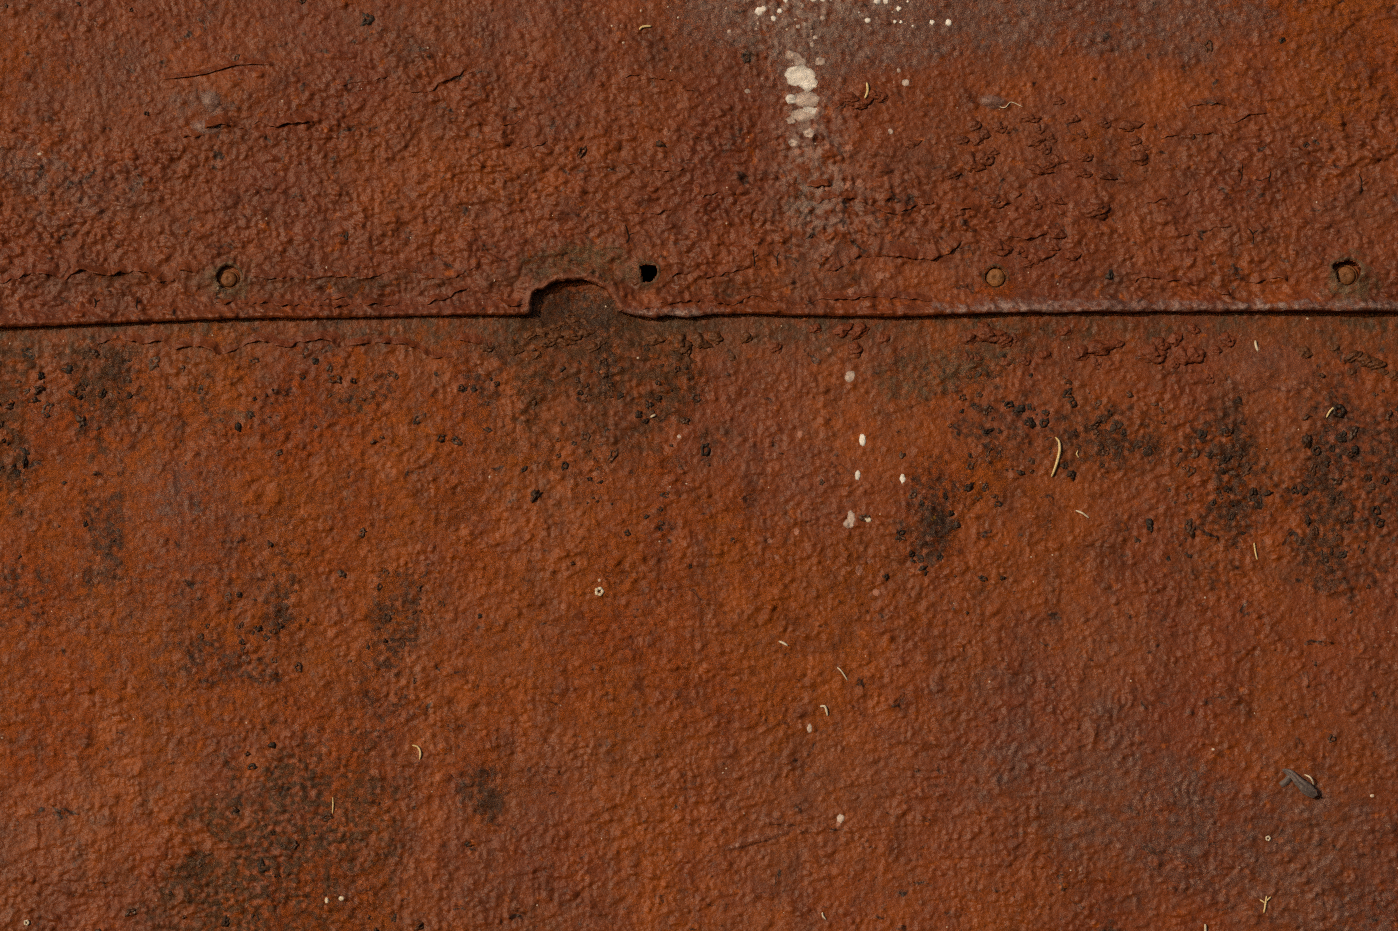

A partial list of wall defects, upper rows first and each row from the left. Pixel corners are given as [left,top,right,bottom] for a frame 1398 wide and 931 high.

water stain [685,0,1275,74]
rust [832,90,889,110]
rust [944,96,1152,181]
rust [466,302,753,448]
rust [809,322,891,359]
rust [940,321,1052,393]
rust [1059,323,1236,384]
rust [1178,343,1398,600]
spalling [895,530,943,576]
spalling [1134,518,1154,543]
rust [182,574,296,684]
rust [136,677,411,931]